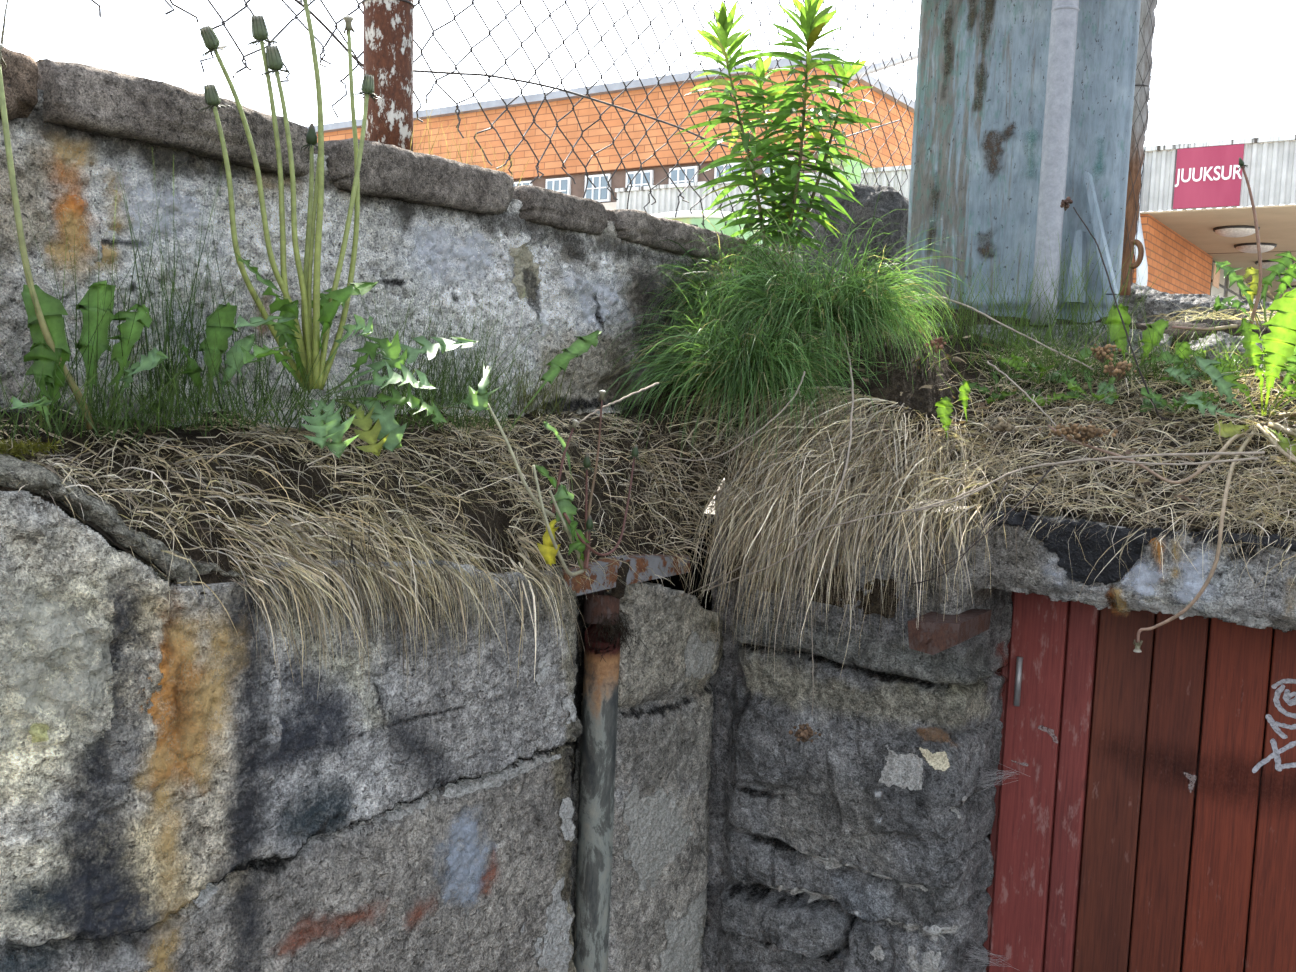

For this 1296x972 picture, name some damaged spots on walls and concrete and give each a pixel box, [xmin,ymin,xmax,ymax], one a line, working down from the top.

damp [943,0,995,110]
corrosion [55,145,87,267]
damp [928,186,939,252]
corrosion [563,553,690,596]
spalling [1069,592,1110,605]
spalling [1126,599,1273,627]
corrosion [140,623,229,882]